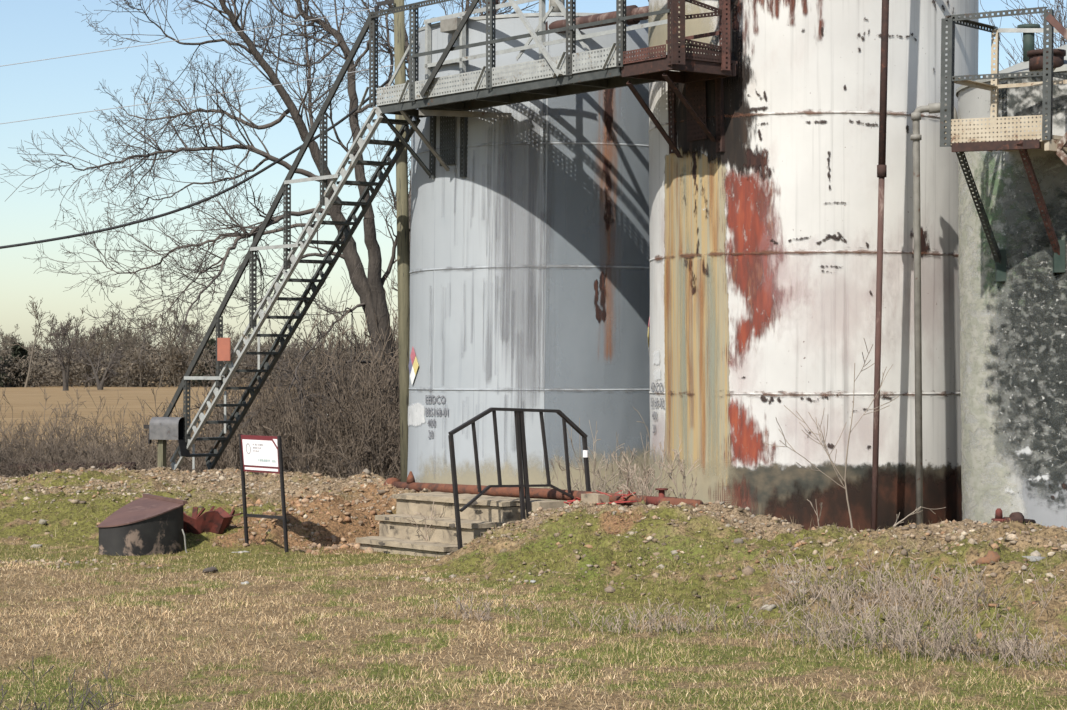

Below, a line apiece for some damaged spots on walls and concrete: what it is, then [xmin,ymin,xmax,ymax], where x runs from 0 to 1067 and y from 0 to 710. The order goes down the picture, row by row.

corrosion [603,88,614,253]
damp [745,145,771,180]
corrosion [584,267,614,355]
corrosion [654,170,959,365]
peeling [770,232,847,244]
damp [985,156,1067,528]
corrosion [725,391,805,467]
corrosion [708,468,963,532]